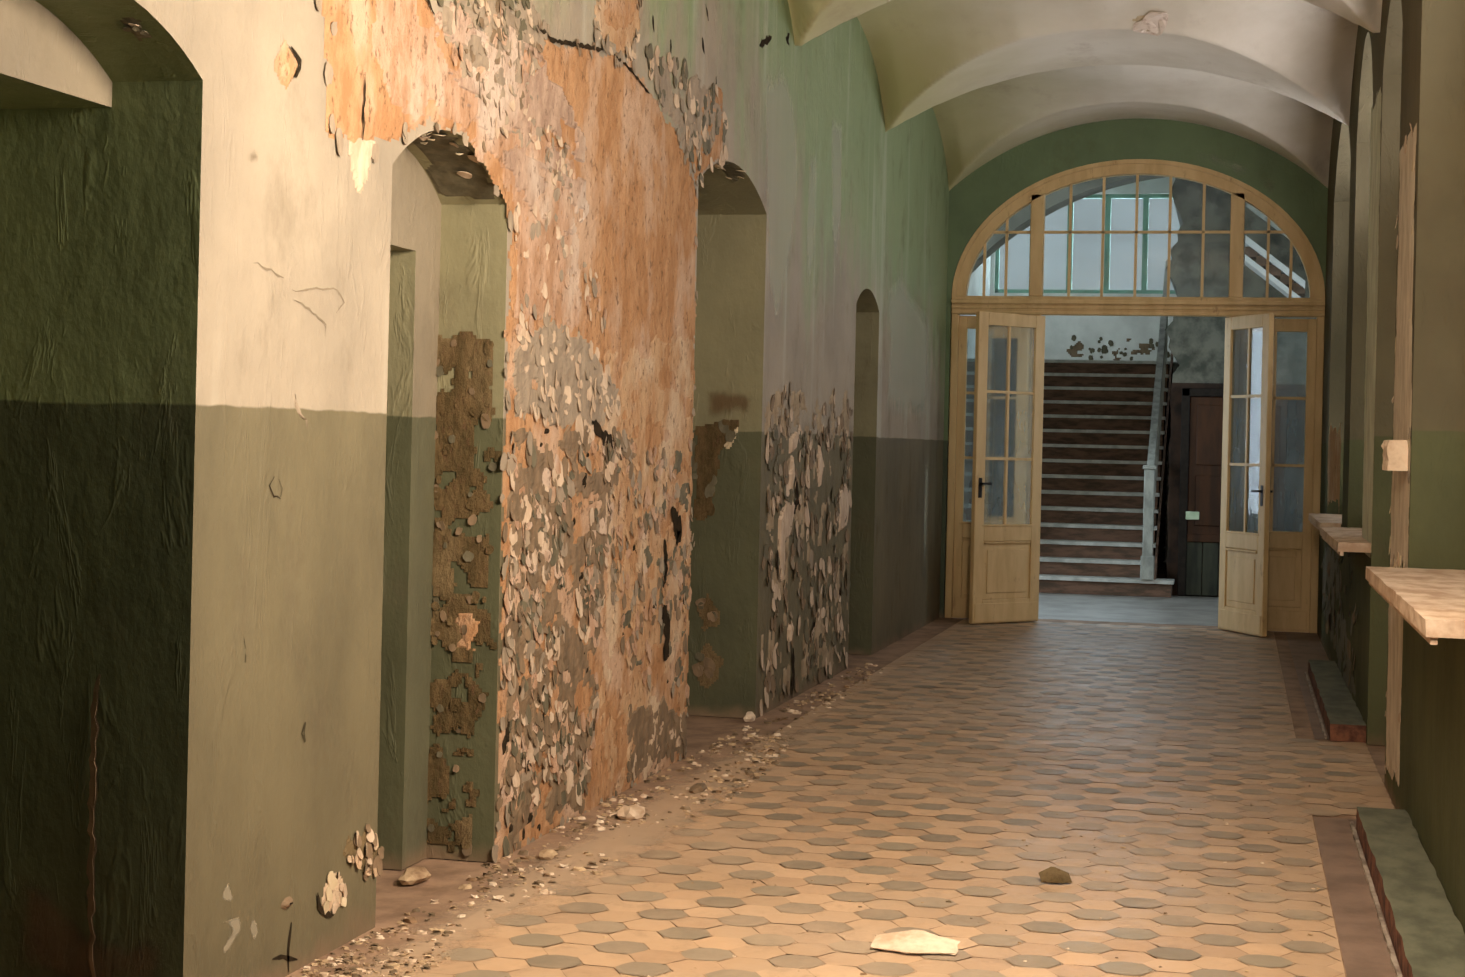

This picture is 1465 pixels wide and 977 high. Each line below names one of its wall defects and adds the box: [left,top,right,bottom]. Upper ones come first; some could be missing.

flaking render [274,40,302,90]
flaking render [315,0,746,863]
peeling [759,382,853,717]
flaking render [317,824,384,918]